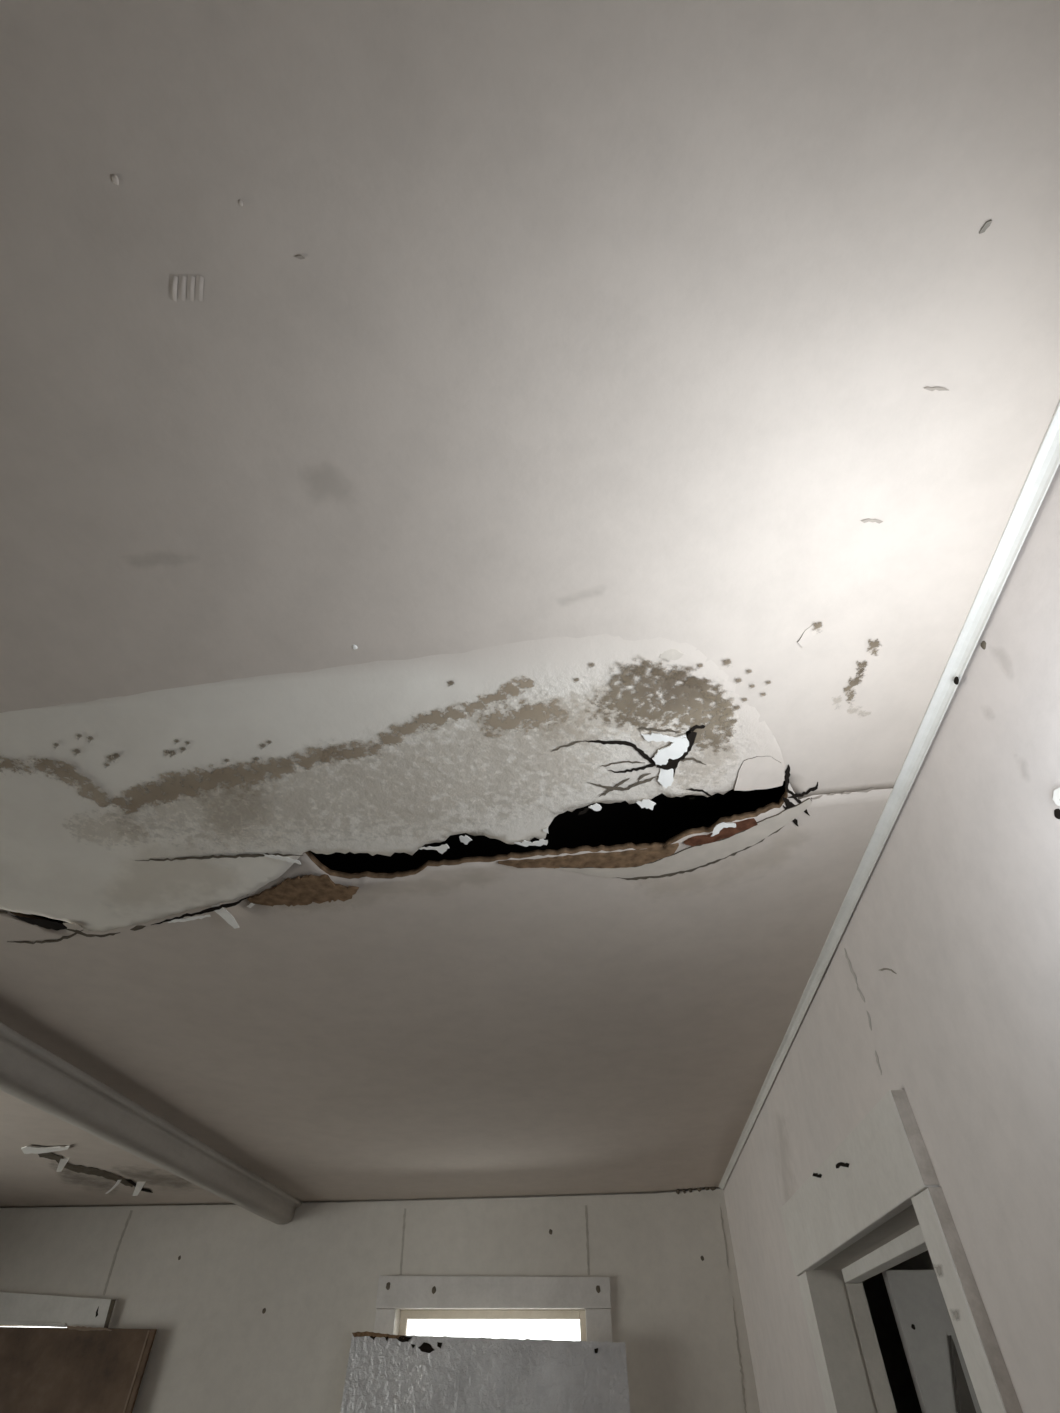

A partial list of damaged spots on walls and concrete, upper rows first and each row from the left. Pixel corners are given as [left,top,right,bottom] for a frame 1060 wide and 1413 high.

leakage [0,679,569,814]
spalling [264,725,812,878]
leakage [588,659,771,752]
crack [617,764,875,880]